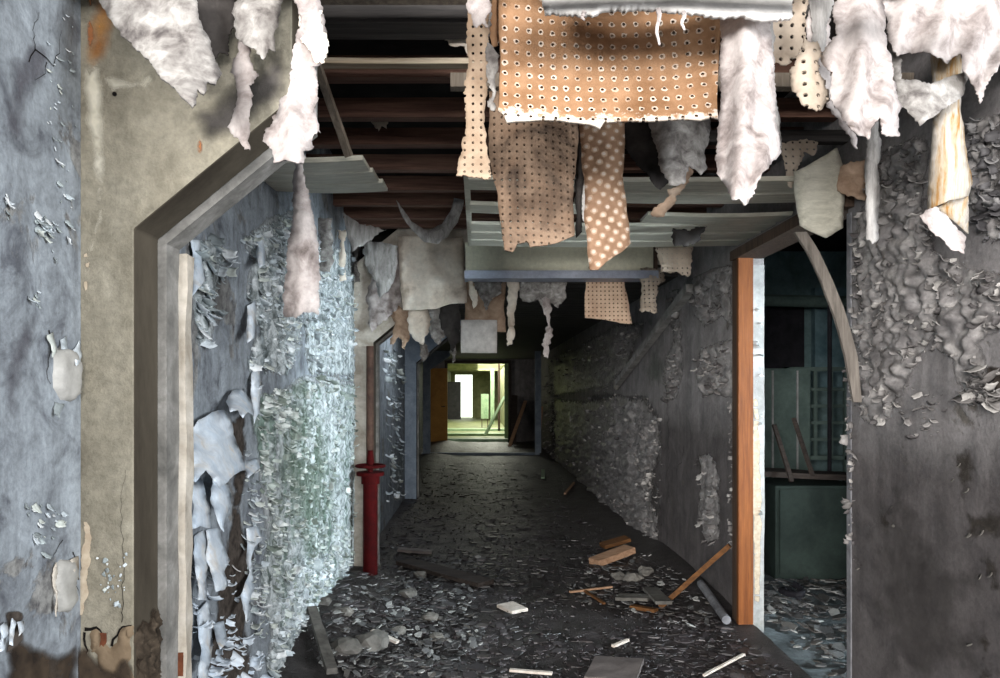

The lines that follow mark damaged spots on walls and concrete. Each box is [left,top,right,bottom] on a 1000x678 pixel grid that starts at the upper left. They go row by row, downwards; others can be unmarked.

crack [29,15,62,80]
peeling [964,113,1000,243]
peeling [178,208,360,678]
peeling [546,290,732,550]
peeling [839,137,1000,570]
spalling [90,609,163,678]